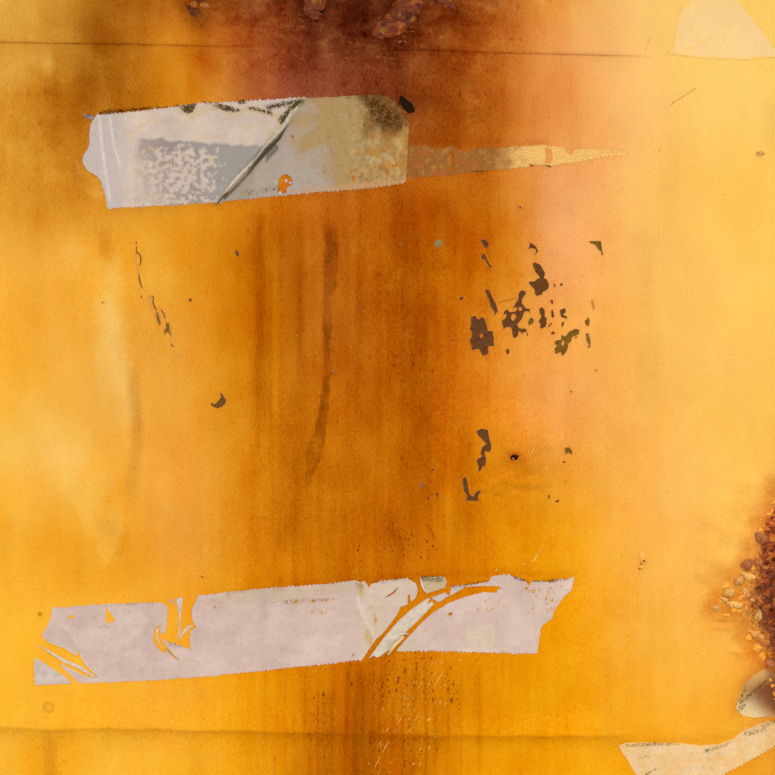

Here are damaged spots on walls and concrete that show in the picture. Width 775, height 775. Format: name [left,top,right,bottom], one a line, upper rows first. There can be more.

corrosion [183,0,525,146]
peeling [469,239,595,356]
peeling [210,392,227,409]
corrosion [219,158,522,775]
peeling [462,476,481,501]
peeling [476,428,492,472]
corrosion [712,491,775,700]